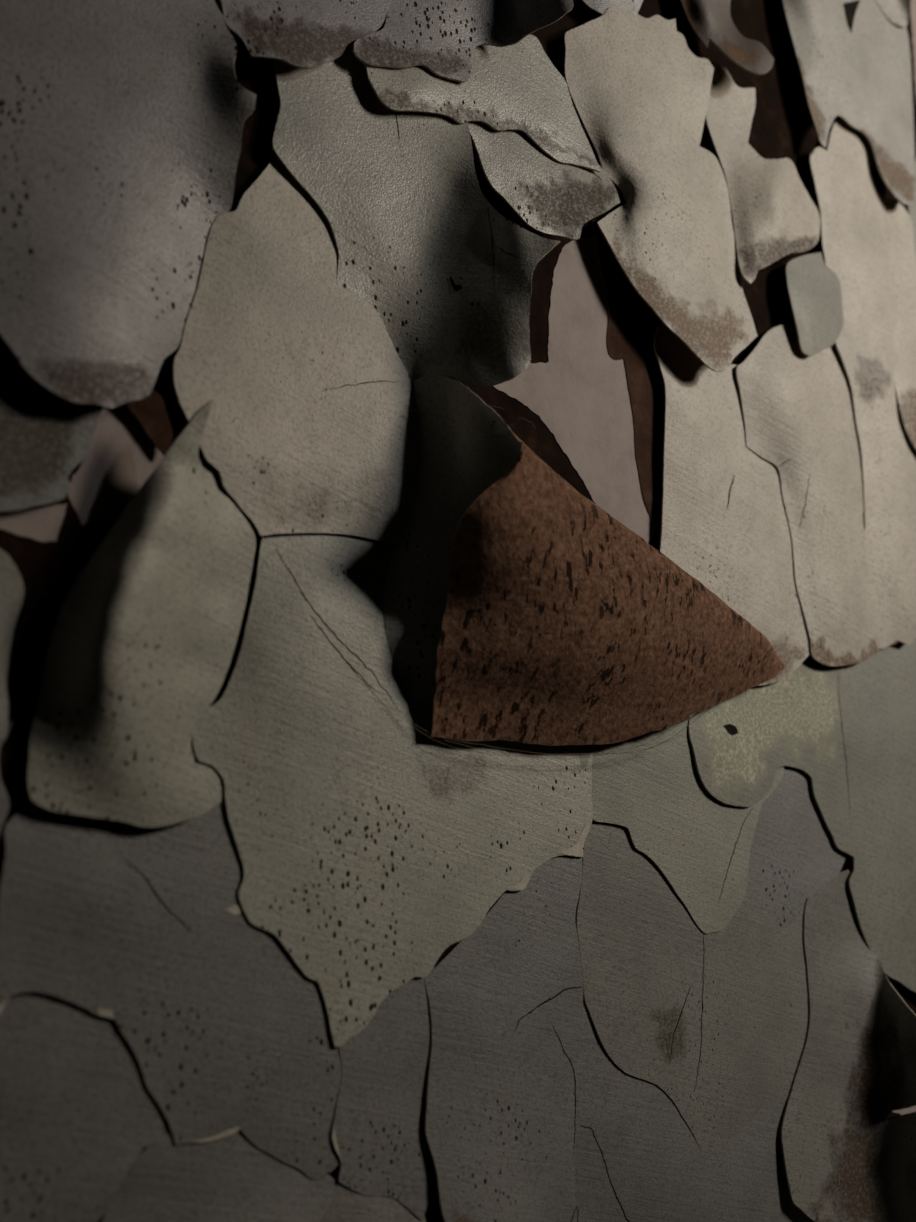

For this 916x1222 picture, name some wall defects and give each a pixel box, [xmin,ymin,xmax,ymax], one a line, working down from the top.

peeling [0,533,814,1222]
peeling [220,0,916,1222]
crack [515,987,630,1222]
crack [670,938,705,1091]